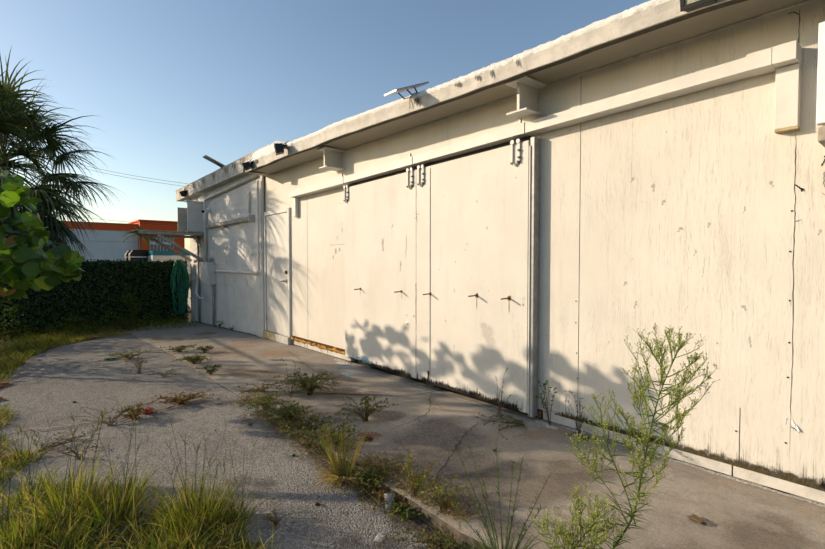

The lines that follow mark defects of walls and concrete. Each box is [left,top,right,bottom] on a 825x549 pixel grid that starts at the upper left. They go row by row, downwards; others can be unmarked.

crack [792,135,804,307]
water stain [348,356,523,411]
crack [790,327,798,432]